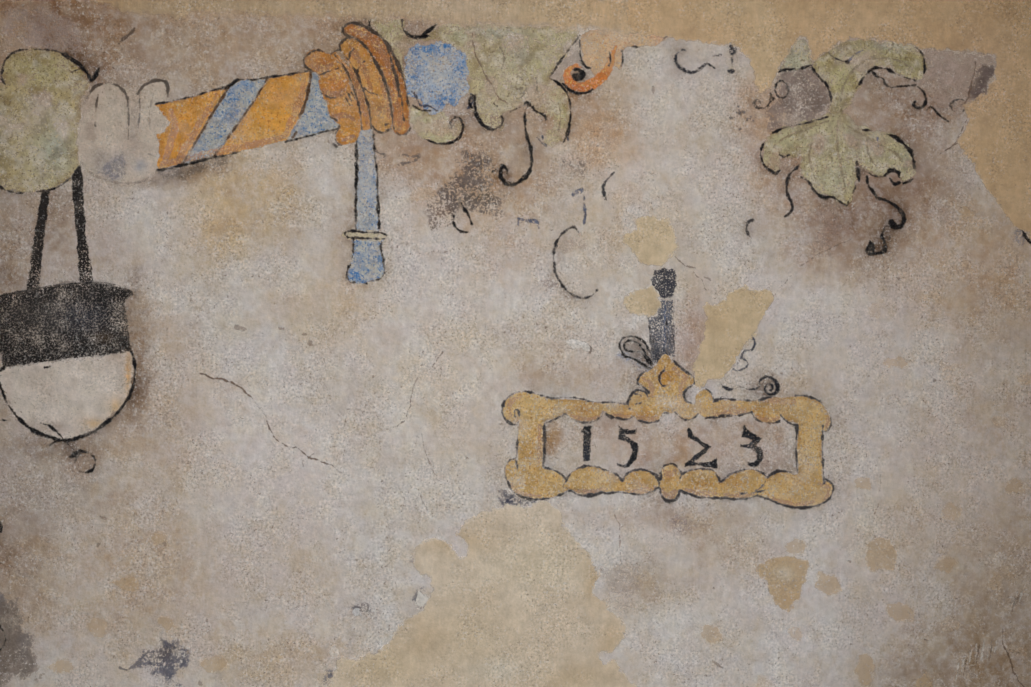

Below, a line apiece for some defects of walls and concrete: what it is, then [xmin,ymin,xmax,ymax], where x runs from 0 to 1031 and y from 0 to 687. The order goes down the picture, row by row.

crack [200,373,253,399]
crack [267,421,333,466]
spalling [756,556,809,612]